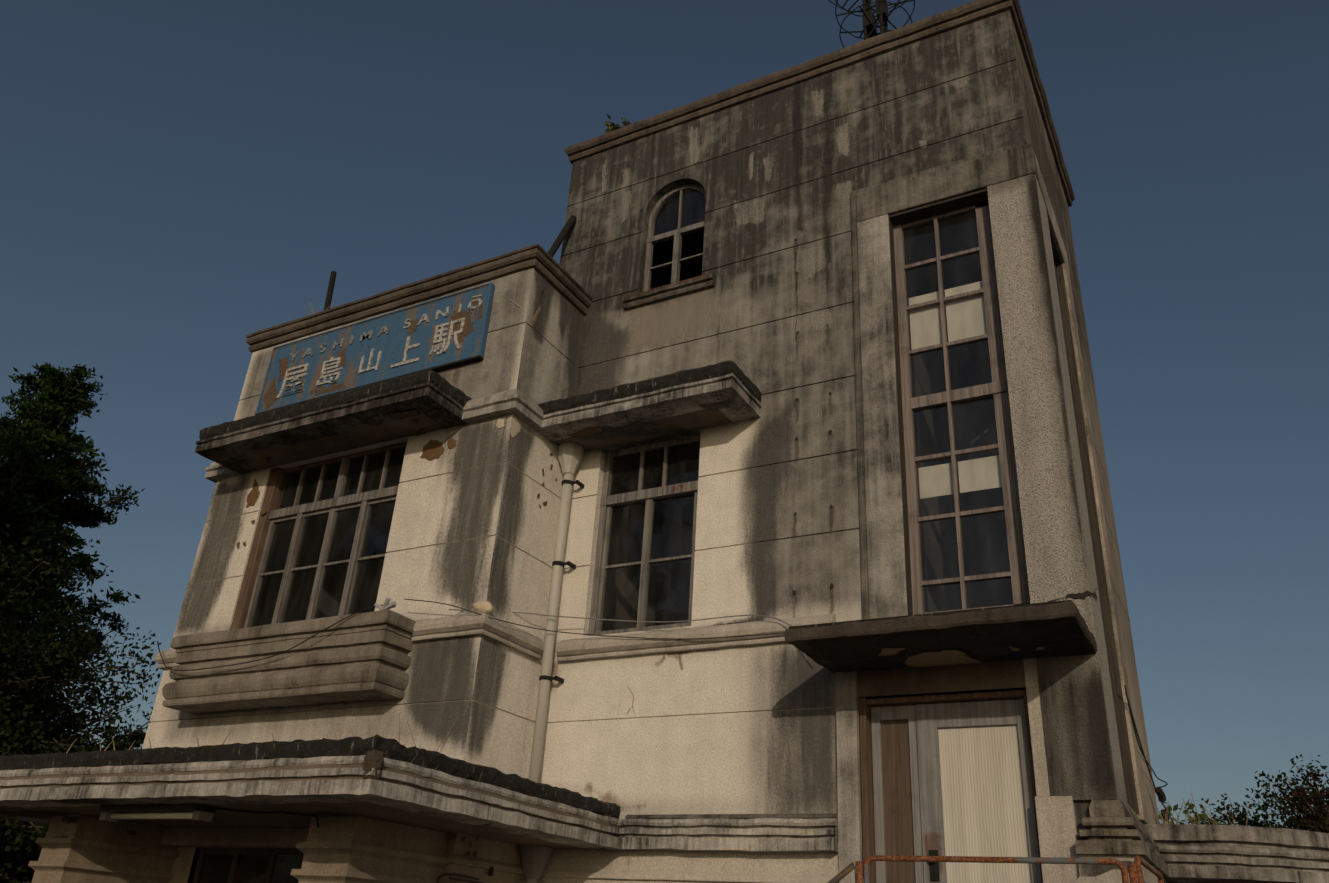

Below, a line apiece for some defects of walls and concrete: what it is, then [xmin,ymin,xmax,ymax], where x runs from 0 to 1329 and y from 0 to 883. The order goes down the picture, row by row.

leakage [794,73,851,278]
leakage [534,271,724,397]
peeling [420,438,456,461]
leakage [437,419,534,614]
leakage [718,402,791,625]
leakage [409,636,506,753]
peeling [879,648,983,667]
leakage [776,619,1090,814]
crack [1048,588,1106,626]